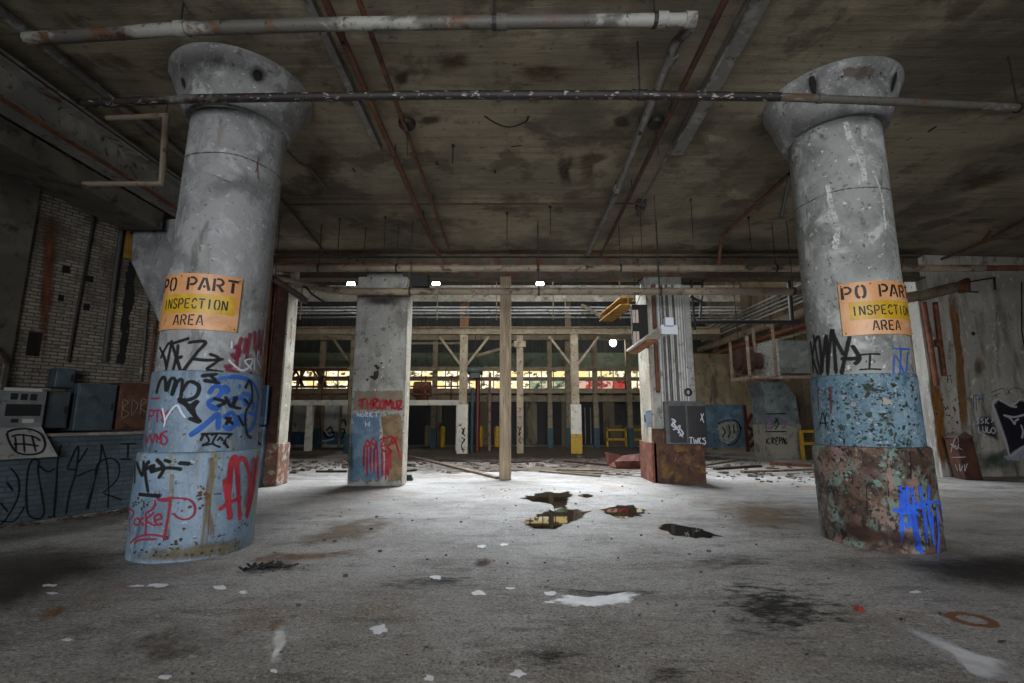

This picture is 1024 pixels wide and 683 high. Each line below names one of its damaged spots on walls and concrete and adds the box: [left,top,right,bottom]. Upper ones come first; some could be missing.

leakage [559,155,605,180]
rust [41,225,56,333]
peeling [816,377,920,521]
rust [928,378,948,463]
rust [838,524,917,545]